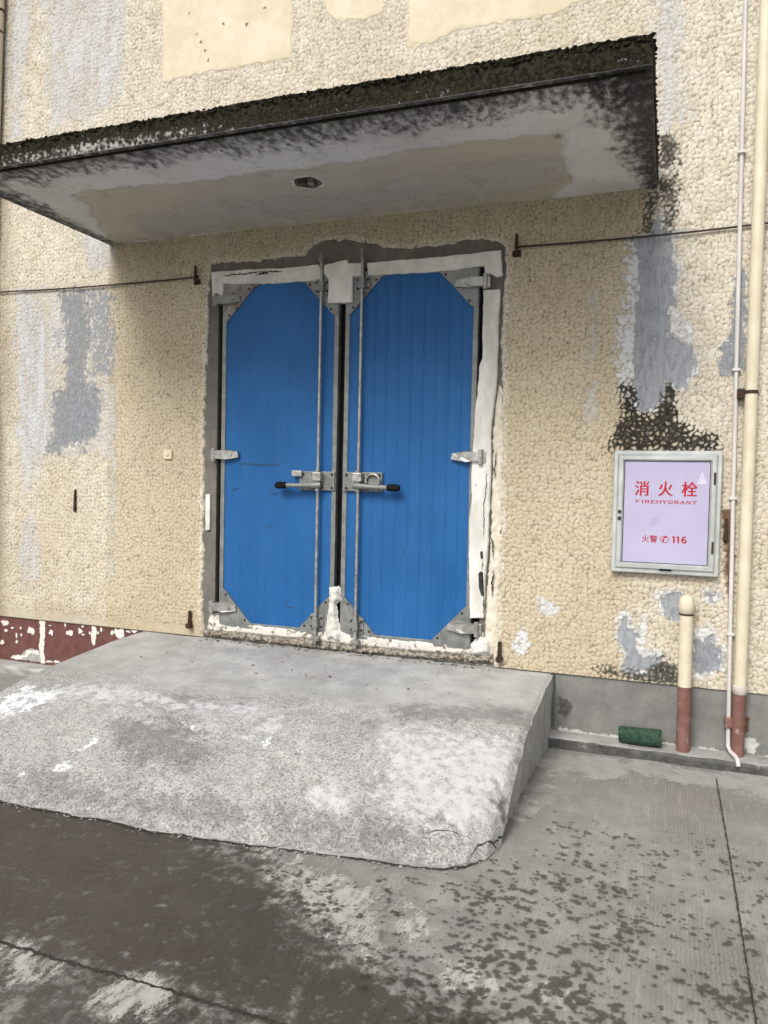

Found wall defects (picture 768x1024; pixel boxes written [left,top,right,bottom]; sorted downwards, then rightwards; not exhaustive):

leakage [0,0,684,269]
crack [224,269,281,277]
peeling [610,209,749,415]
peeling [37,285,119,458]
leakage [602,381,723,454]
peeling [0,620,59,663]
peeling [64,623,137,645]
peeling [611,609,670,676]
peeling [654,588,685,623]
peeling [692,623,728,679]
crack [0,801,504,870]